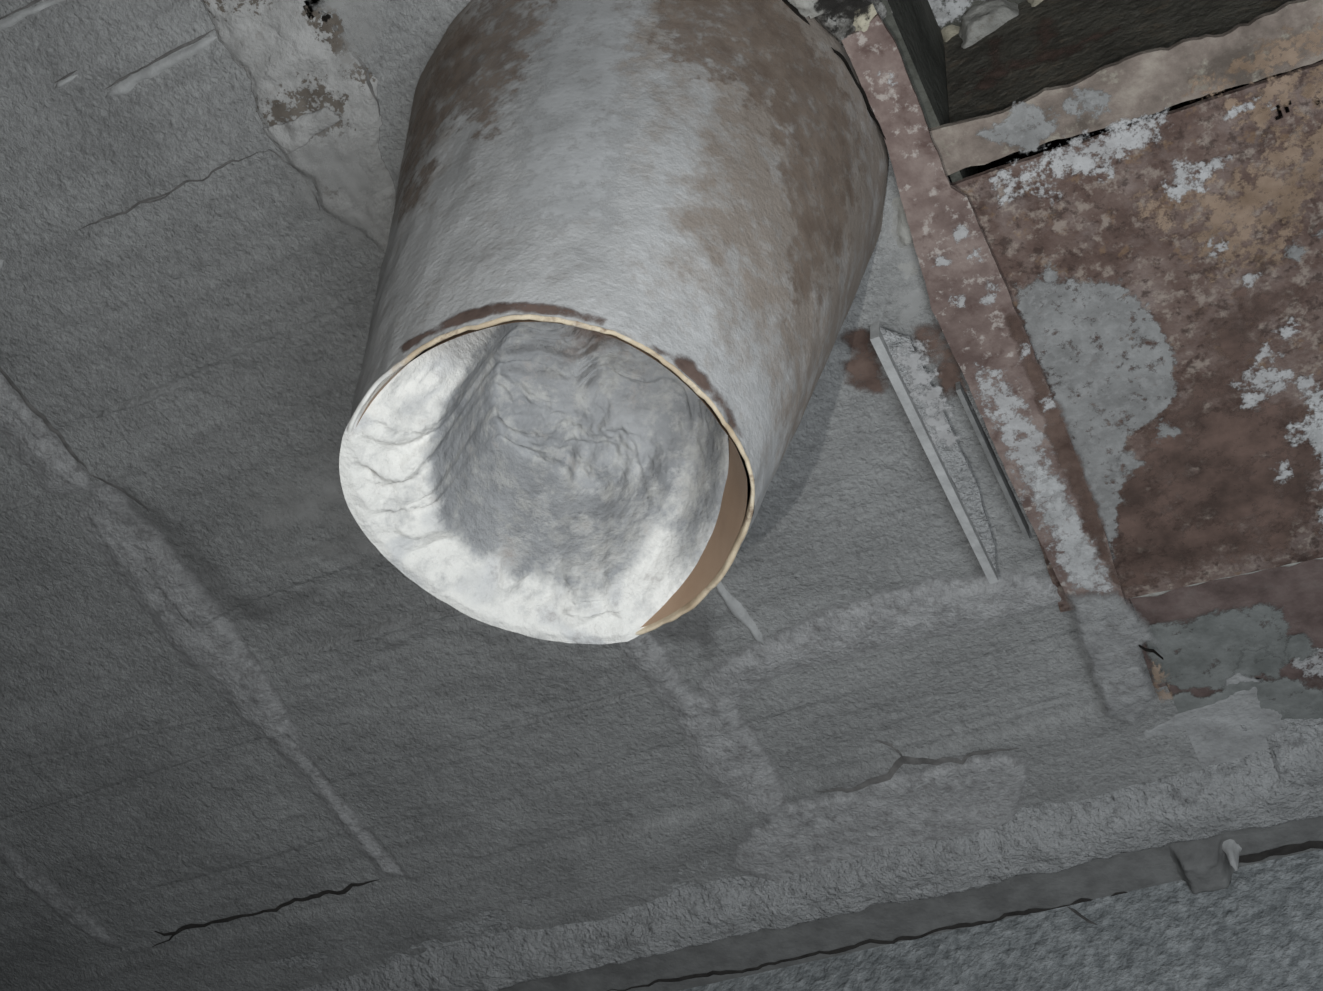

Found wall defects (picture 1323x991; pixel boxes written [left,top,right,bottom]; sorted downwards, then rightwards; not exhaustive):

flaking render [201,0,396,253]
efflorescence [1224,99,1274,120]
rust [1007,17,1323,592]
crack [818,740,1019,793]
crack [152,880,377,947]